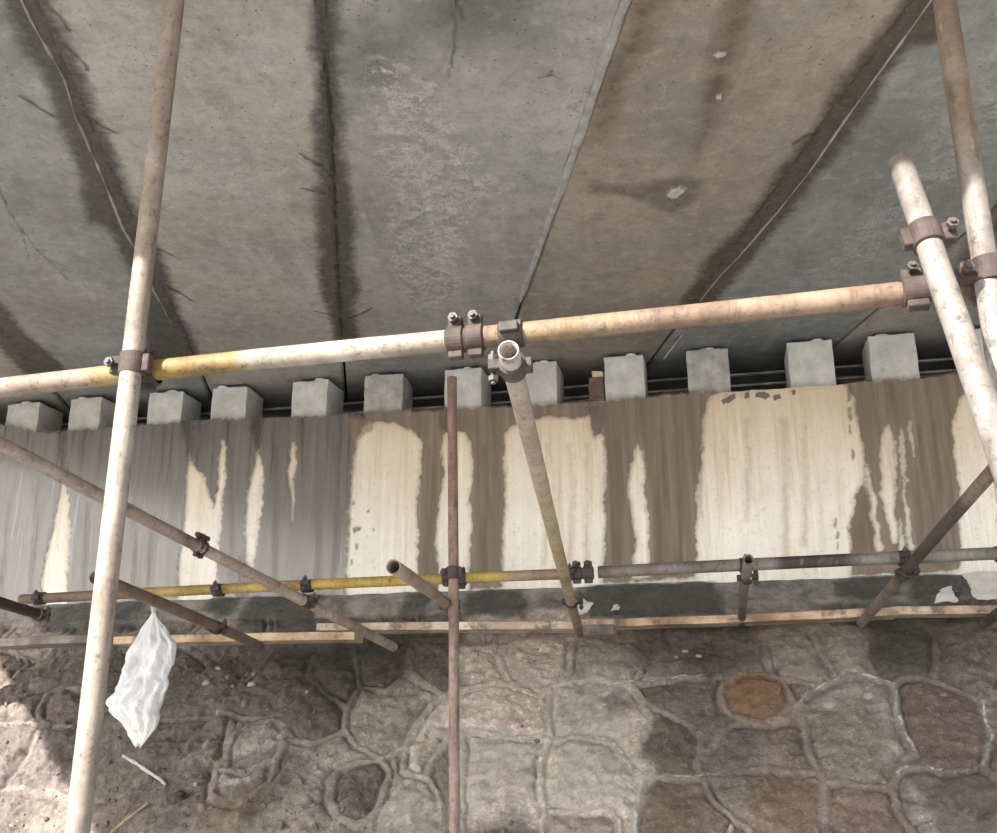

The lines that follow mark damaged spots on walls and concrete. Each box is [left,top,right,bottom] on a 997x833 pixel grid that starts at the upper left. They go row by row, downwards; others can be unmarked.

damp [7,0,138,271]
spalling [652,183,688,206]
damp [683,0,938,305]
damp [0,305,63,374]
damp [146,248,197,359]
damp [0,452,103,633]
damp [0,424,113,490]
damp [119,406,525,625]
damp [532,392,712,566]
damp [583,573,722,618]
damp [834,373,964,553]
damp [835,561,964,599]